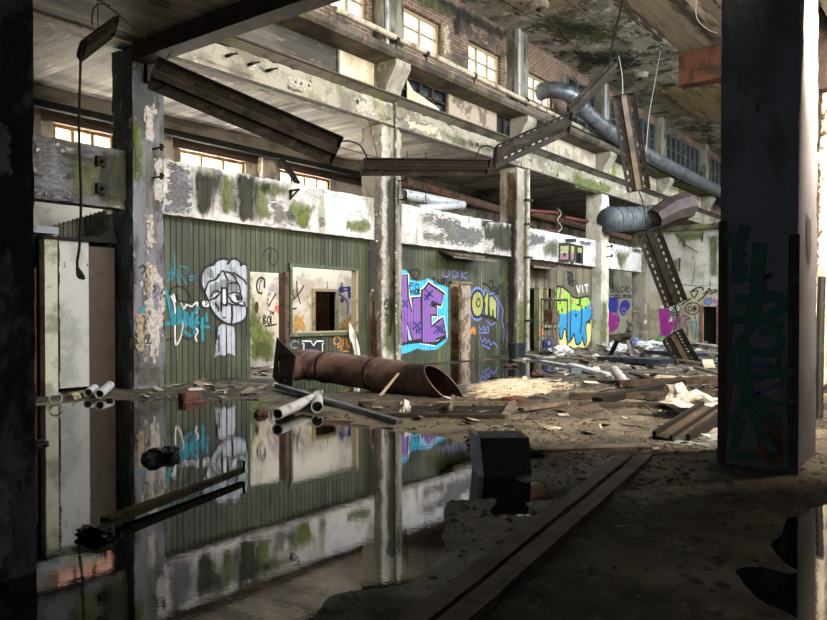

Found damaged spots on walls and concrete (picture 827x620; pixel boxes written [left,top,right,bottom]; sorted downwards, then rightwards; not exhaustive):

damp [559,50,653,68]
peeling [144,106,155,142]
damp [192,170,288,221]
peeling [144,214,157,248]
damp [299,209,307,228]
peeling [421,211,485,248]
peeling [135,263,166,362]